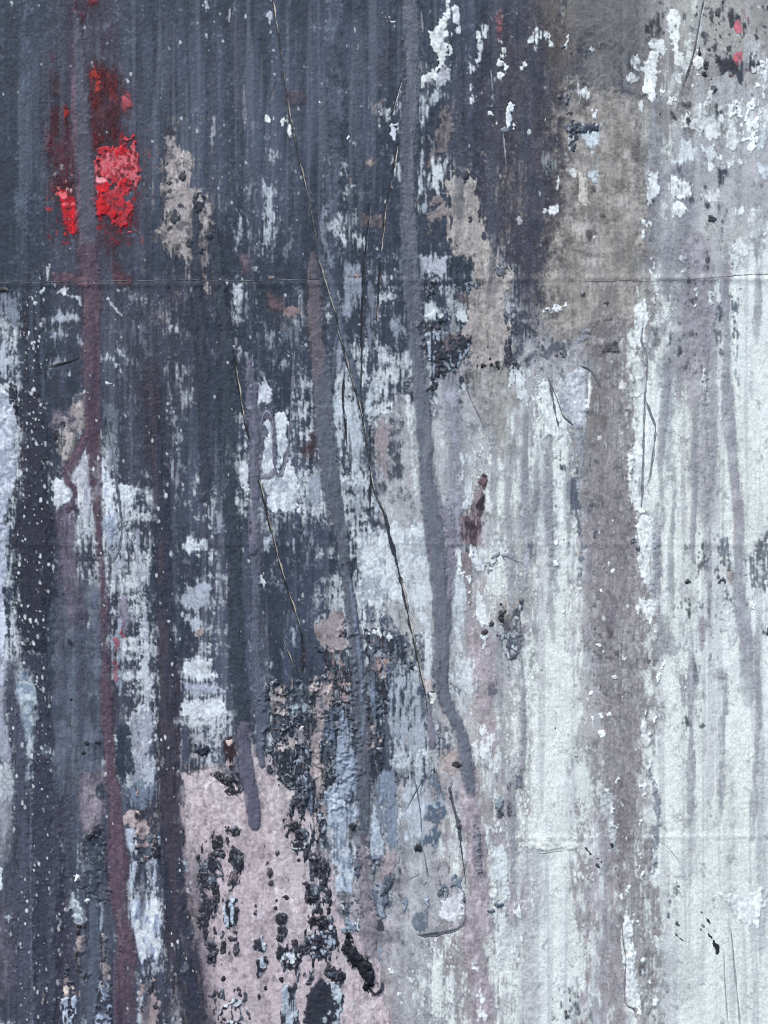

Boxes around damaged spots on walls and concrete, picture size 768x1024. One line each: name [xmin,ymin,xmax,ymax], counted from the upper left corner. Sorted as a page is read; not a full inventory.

peeling [265,293,301,369]
peeling [320,206,383,354]
peeling [390,312,406,340]
peeling [399,0,768,578]
water stain [685,234,714,521]
peeling [175,339,497,1024]
peeling [589,691,612,738]
peeling [595,609,628,662]
water stain [578,305,668,1024]
peeling [455,774,535,964]